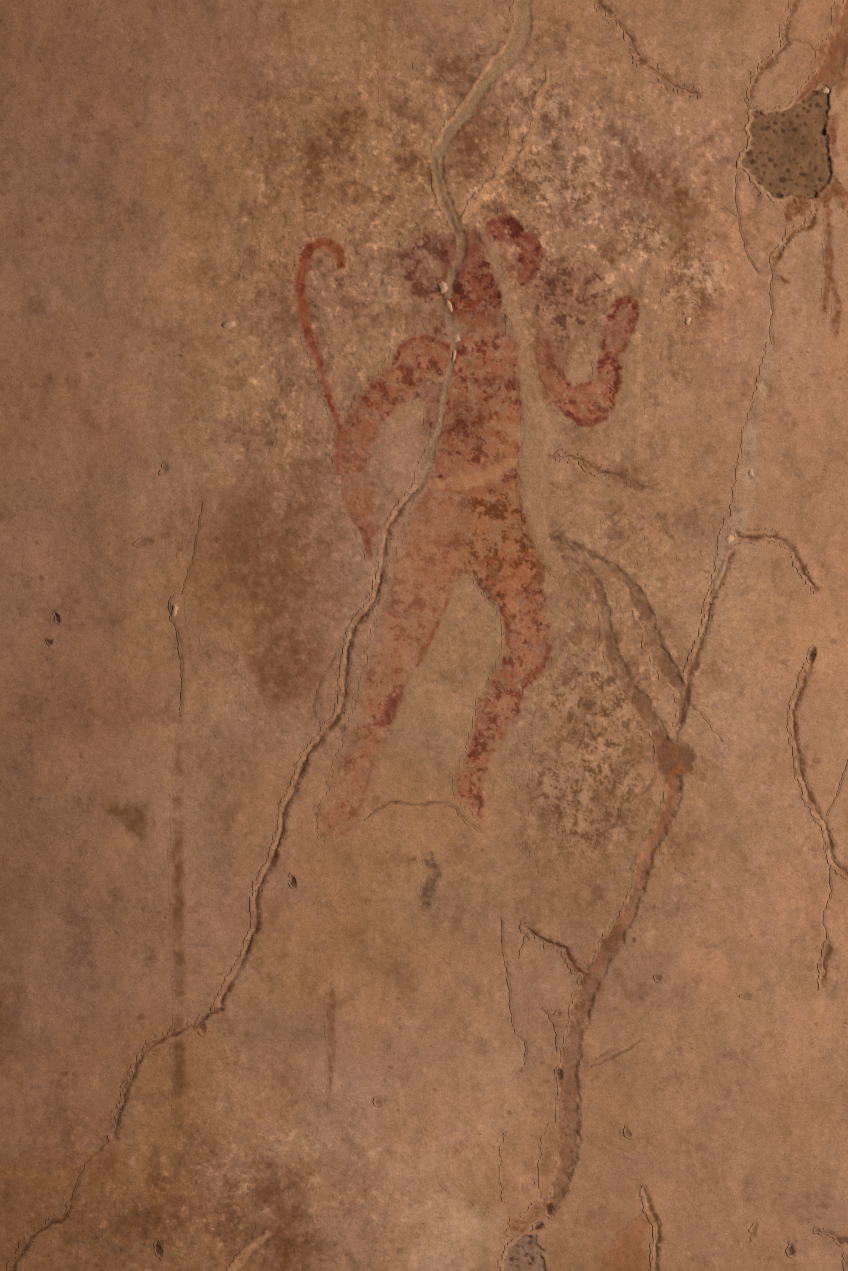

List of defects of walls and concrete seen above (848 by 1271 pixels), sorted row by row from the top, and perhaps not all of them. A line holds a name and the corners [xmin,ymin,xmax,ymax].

crack [595,0,705,99]
crack [744,0,823,114]
flaking render [737,79,837,205]
crack [725,174,824,350]
crack [675,526,824,742]
crack [7,482,426,1271]
crack [365,800,484,832]
crack [596,772,658,845]
crack [787,663,848,990]
crack [501,917,592,1065]
flaking render [498,1198,557,1271]
crack [640,1184,668,1271]